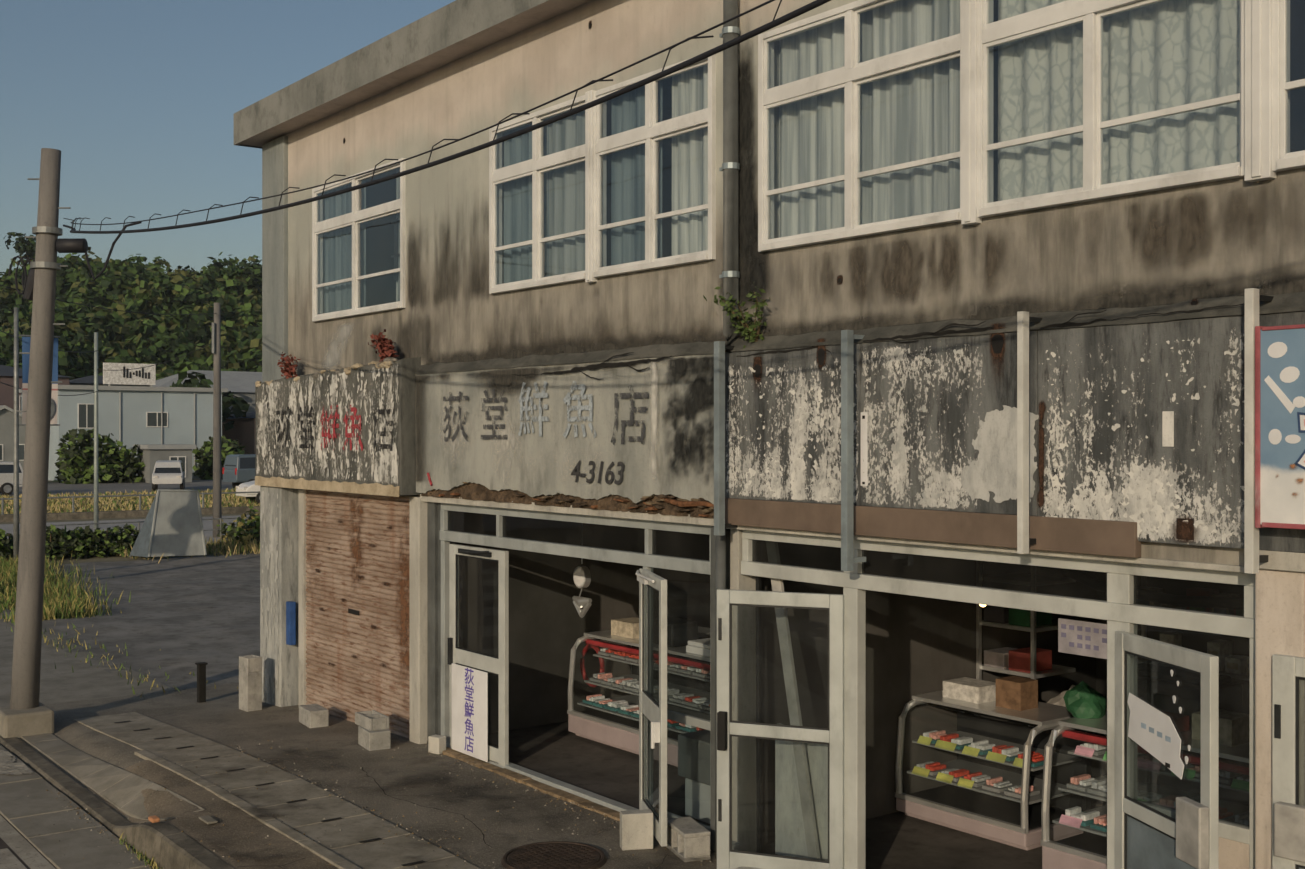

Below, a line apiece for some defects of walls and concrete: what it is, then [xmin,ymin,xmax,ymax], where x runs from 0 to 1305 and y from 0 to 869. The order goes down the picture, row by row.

water stain [738,55,768,304]
water stain [960,195,1305,321]
peeling [261,491,278,702]
peeling [255,357,399,486]
rust [338,497,375,581]
rust [382,555,409,669]
spalling [421,482,714,518]
water stain [398,233,958,481]
peeling [725,329,1245,546]